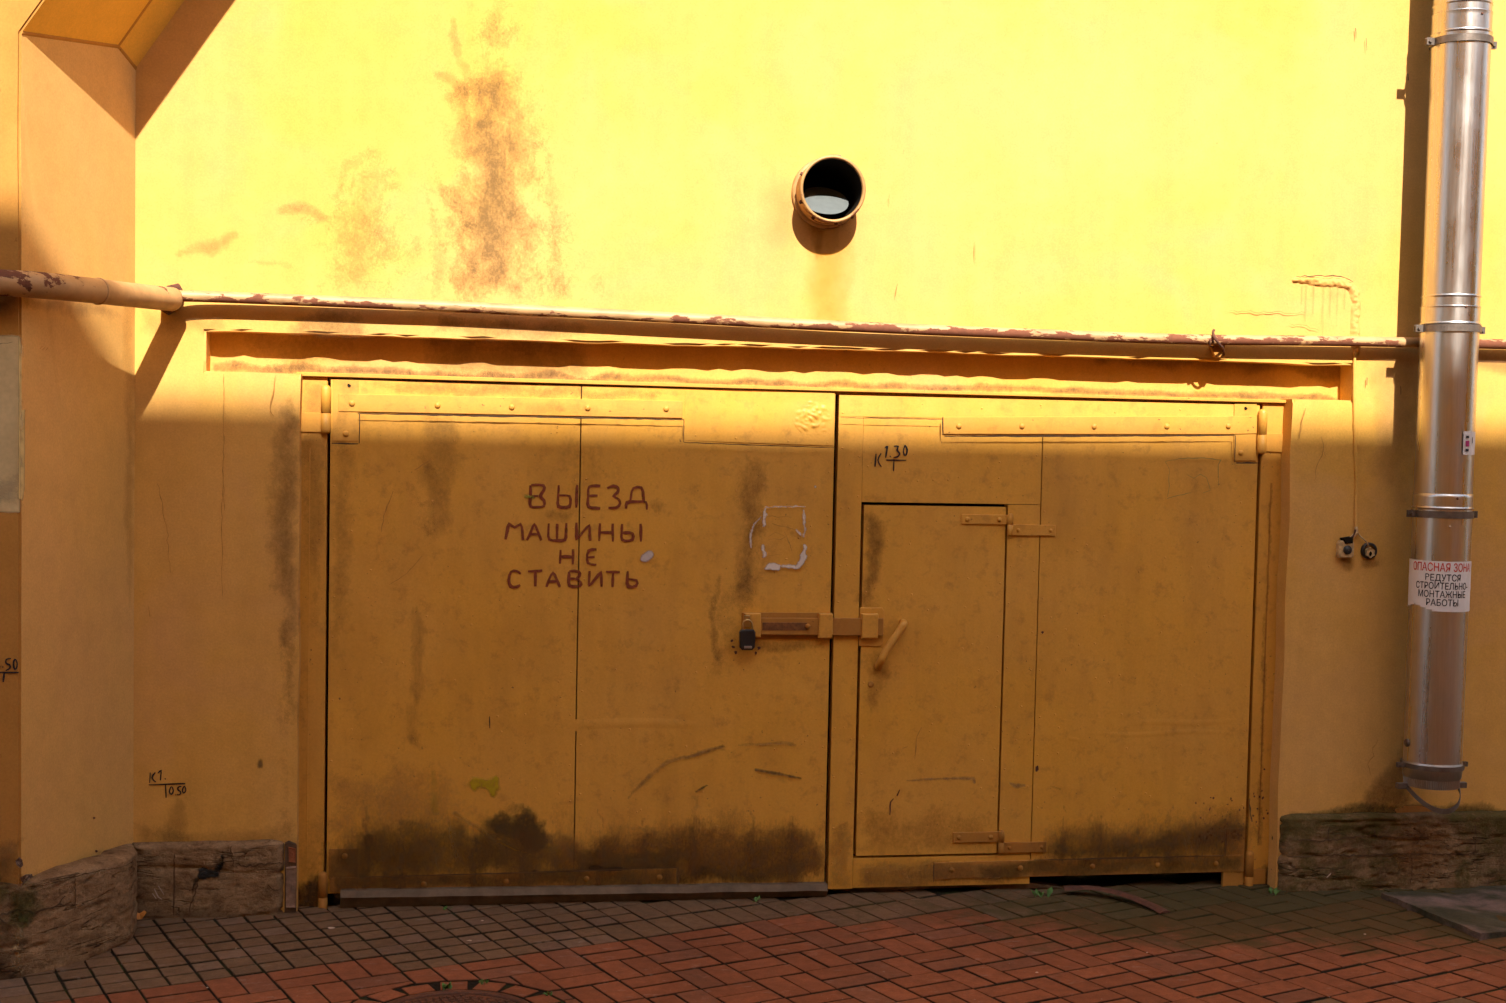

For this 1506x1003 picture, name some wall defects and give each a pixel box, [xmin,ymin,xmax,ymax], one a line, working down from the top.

damp [465,79,520,283]
damp [447,810,552,856]